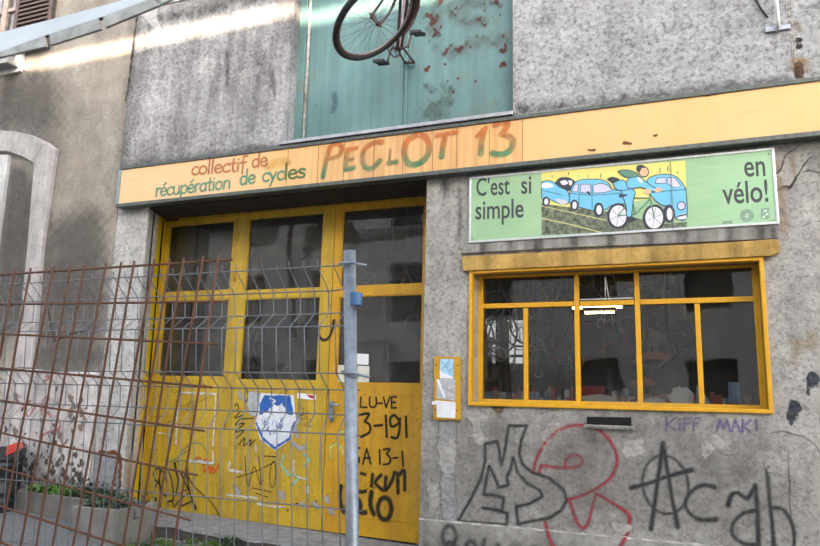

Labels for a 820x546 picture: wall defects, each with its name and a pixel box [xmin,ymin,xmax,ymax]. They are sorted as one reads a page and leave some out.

corrosion [420,0,447,37]
corrosion [788,0,808,78]
crack [776,145,820,190]